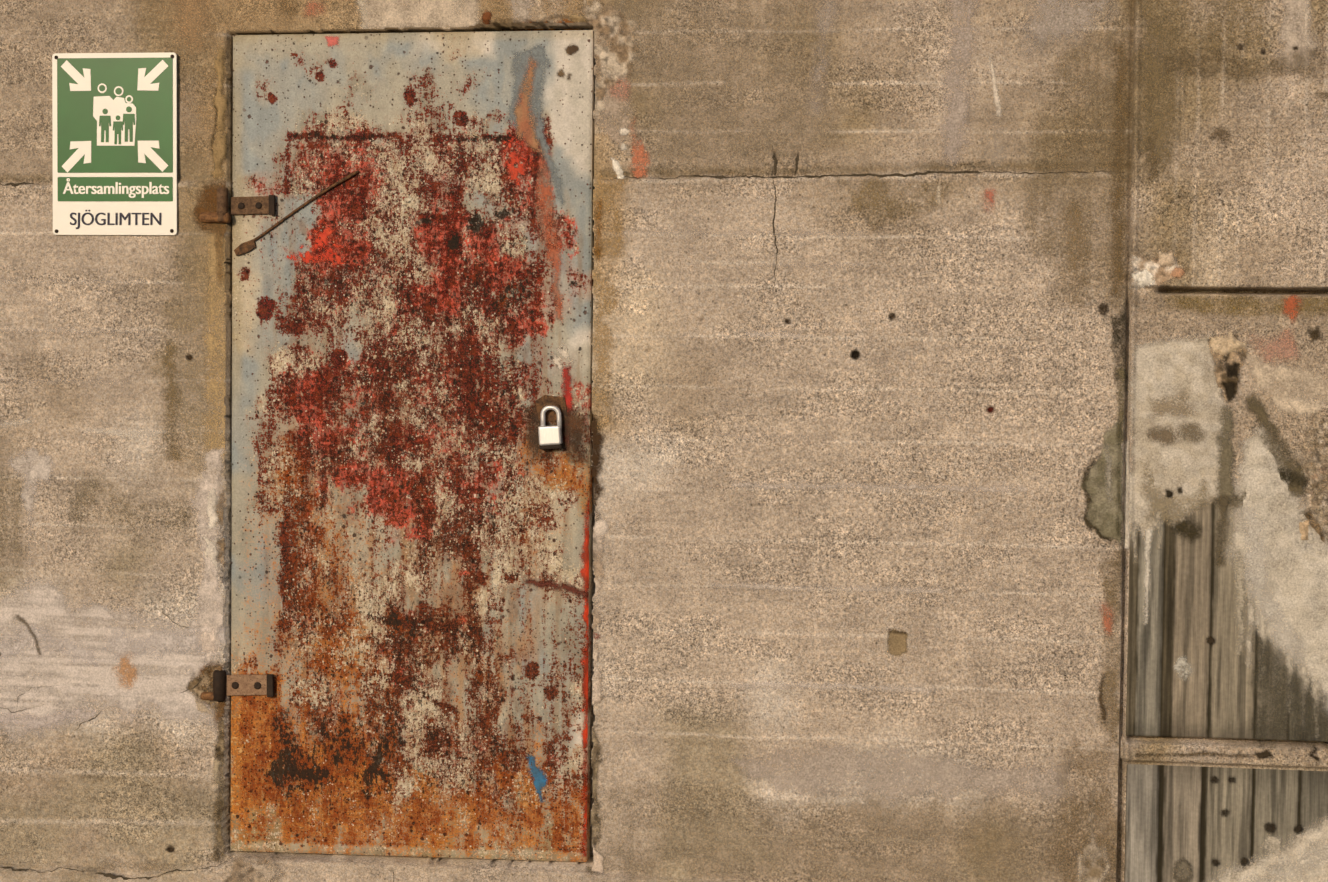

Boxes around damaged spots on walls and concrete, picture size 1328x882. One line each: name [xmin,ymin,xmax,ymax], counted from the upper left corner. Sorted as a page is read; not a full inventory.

corrosion [515,60,562,320]
crack [606,152,1124,287]
spalling [1208,333,1247,401]
peeling [1288,395,1328,415]
peeling [1081,421,1124,544]
spalling [1299,511,1324,543]
damp [0,448,226,740]
corrosion [525,579,589,598]
crack [0,857,233,880]
peeling [1261,836,1281,857]